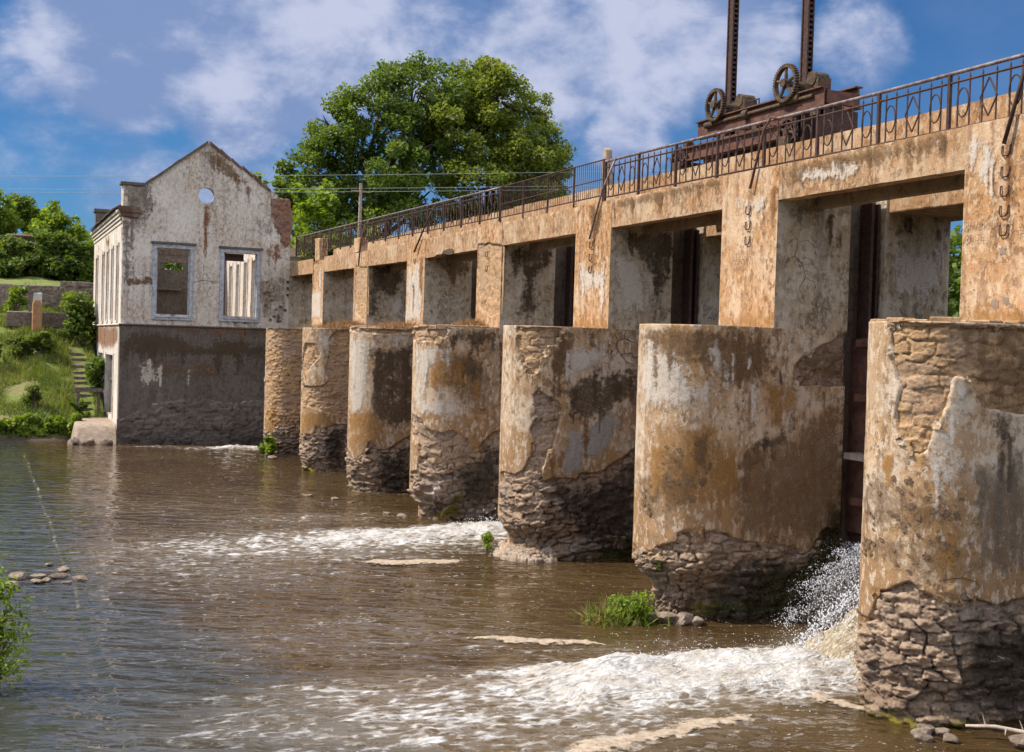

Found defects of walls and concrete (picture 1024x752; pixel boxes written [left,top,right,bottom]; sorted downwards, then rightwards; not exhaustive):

spalling [270,198,293,248]
corrosion [1005,150,1013,210]
leakage [119,330,265,386]
leakage [301,330,503,468]
spalling [116,266,845,620]
leakage [550,327,845,620]
spalling [884,322,1024,456]
spalling [852,475,1024,727]